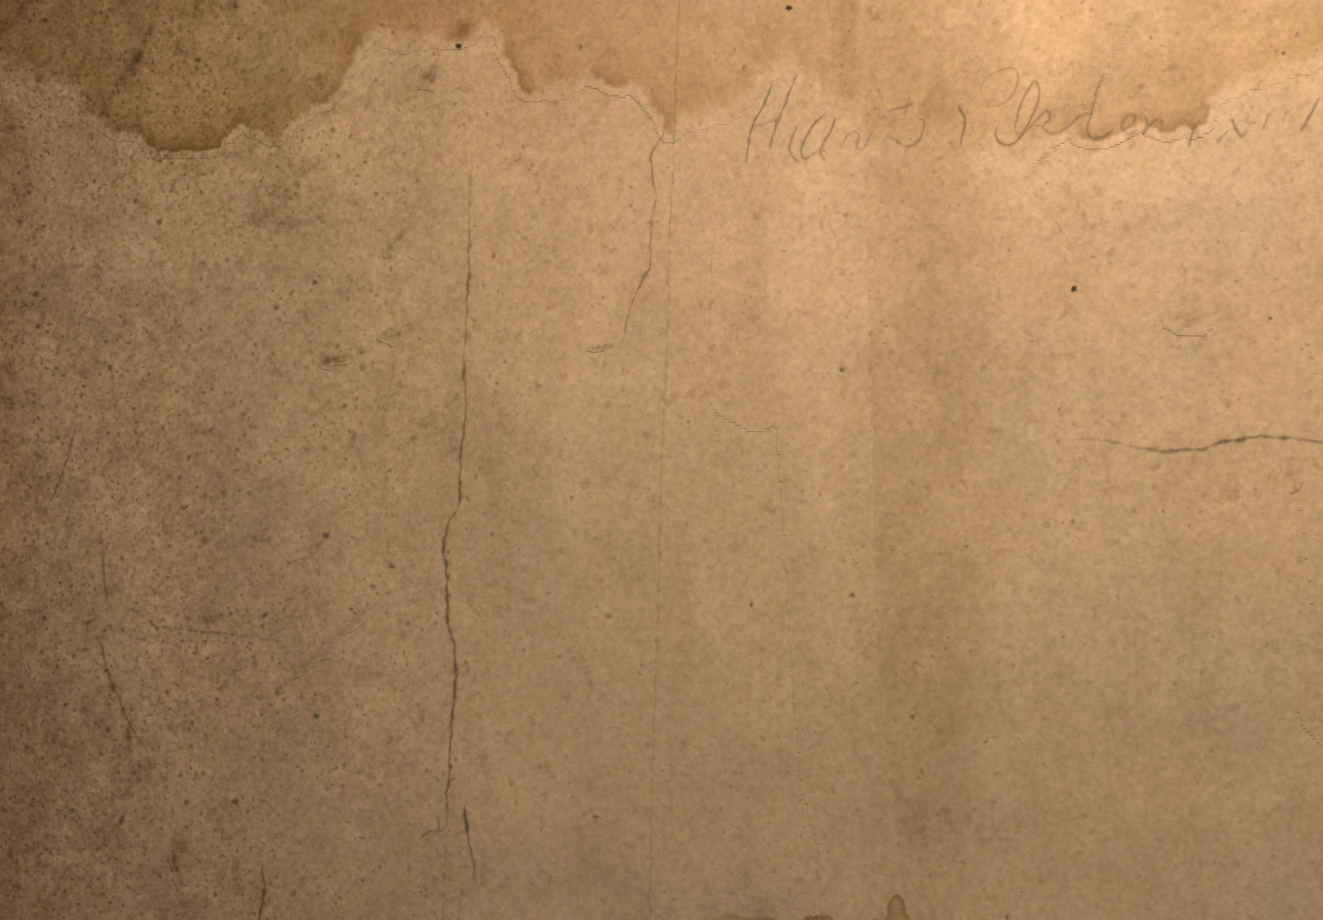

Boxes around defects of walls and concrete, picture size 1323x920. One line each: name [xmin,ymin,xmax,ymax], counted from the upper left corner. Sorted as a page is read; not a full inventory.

water stain [0,0,865,160]
water stain [690,0,1323,920]